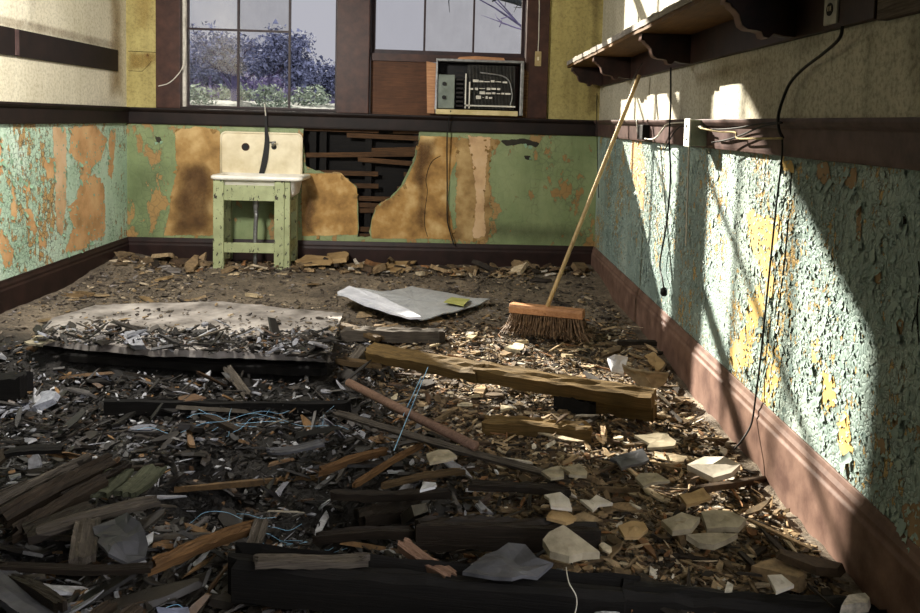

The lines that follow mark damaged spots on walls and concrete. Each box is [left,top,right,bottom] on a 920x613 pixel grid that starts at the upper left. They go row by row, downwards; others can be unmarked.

peeling [0,124,120,272]
peeling [164,126,220,238]
leakage [178,169,210,230]
spalling [301,173,358,239]
spalling [371,135,500,244]
peeling [598,137,920,553]